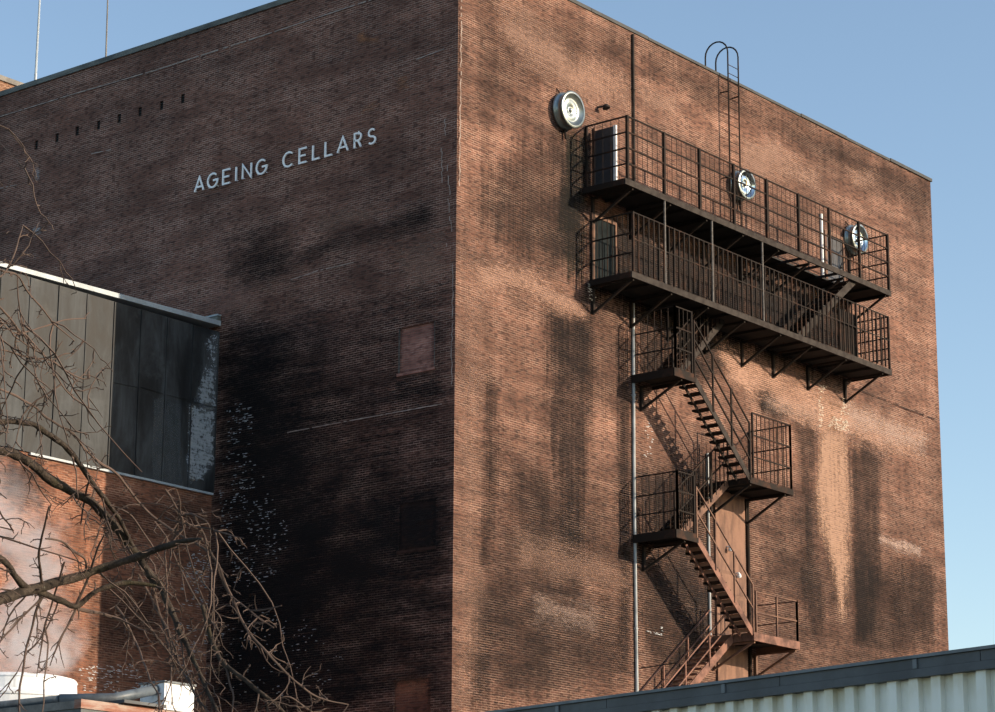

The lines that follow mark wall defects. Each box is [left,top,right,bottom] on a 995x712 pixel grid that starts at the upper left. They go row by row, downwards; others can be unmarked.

damp [478,131,597,301]
peeling [186,335,218,482]
damp [219,406,288,584]
damp [546,313,593,565]
damp [796,384,922,636]